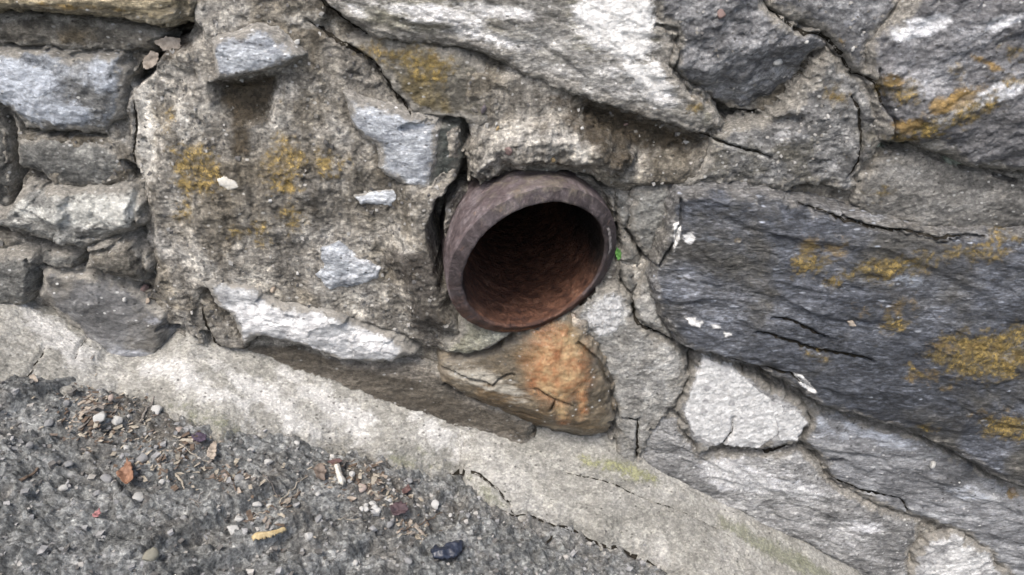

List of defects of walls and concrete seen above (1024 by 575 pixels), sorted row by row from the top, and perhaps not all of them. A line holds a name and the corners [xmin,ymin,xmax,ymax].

crack [768,9,884,174]
crack [700,133,770,157]
crack [798,202,973,240]
corrosion [500,320,586,424]
crack [758,317,871,360]
crack [449,469,667,574]